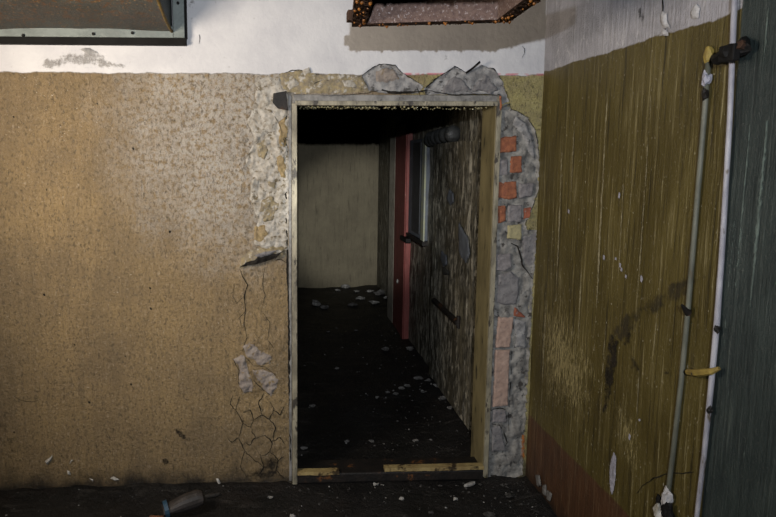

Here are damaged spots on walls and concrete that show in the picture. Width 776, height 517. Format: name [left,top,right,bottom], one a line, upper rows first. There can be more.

crack [233,268,273,351]
flaking render [246,64,540,478]
peeling [233,342,279,396]
crack [229,393,285,477]